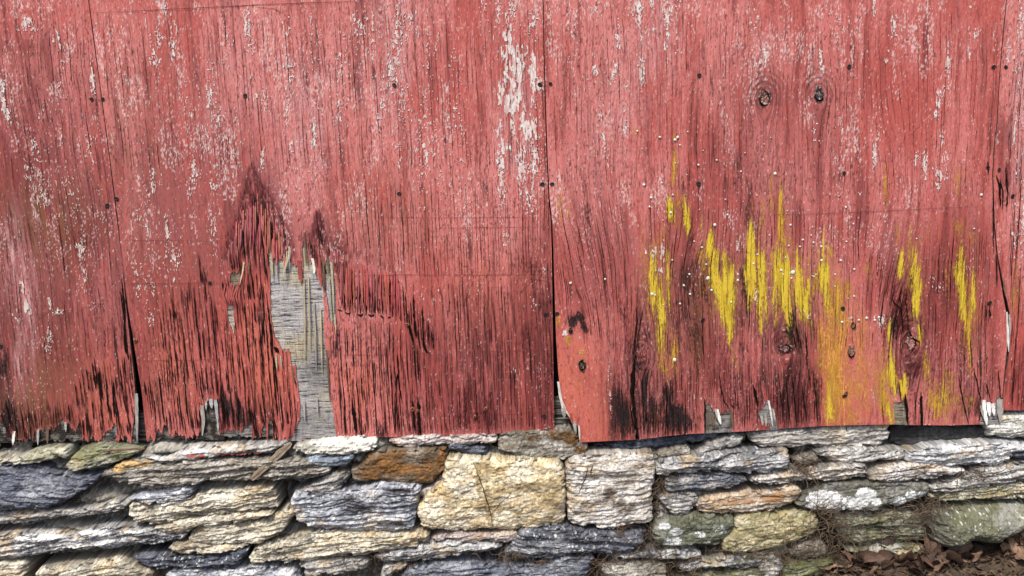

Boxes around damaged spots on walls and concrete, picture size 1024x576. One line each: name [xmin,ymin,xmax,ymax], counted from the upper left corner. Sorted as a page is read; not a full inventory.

peeling [12,280,32,324]
peeling [57,167,89,293]
crack [0,1,1024,456]
peeling [480,0,546,246]
damp [611,134,956,441]